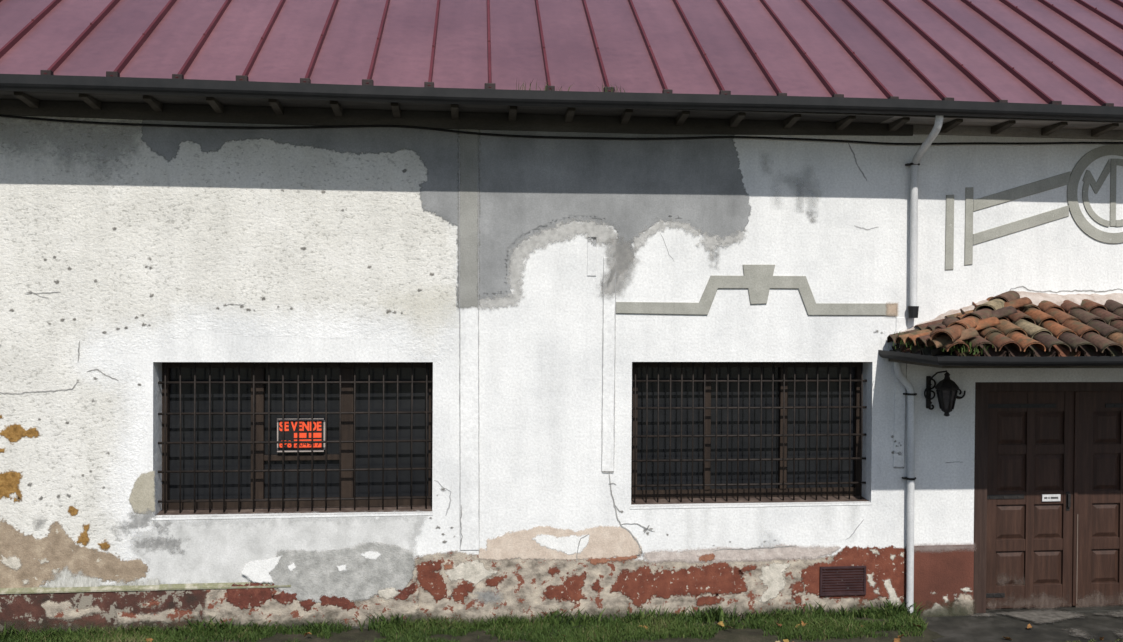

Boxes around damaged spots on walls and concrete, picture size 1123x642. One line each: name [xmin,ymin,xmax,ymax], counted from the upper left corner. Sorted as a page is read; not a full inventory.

peeling [141,120,751,309]
flaking render [0,511,907,628]
crack [609,474,655,556]